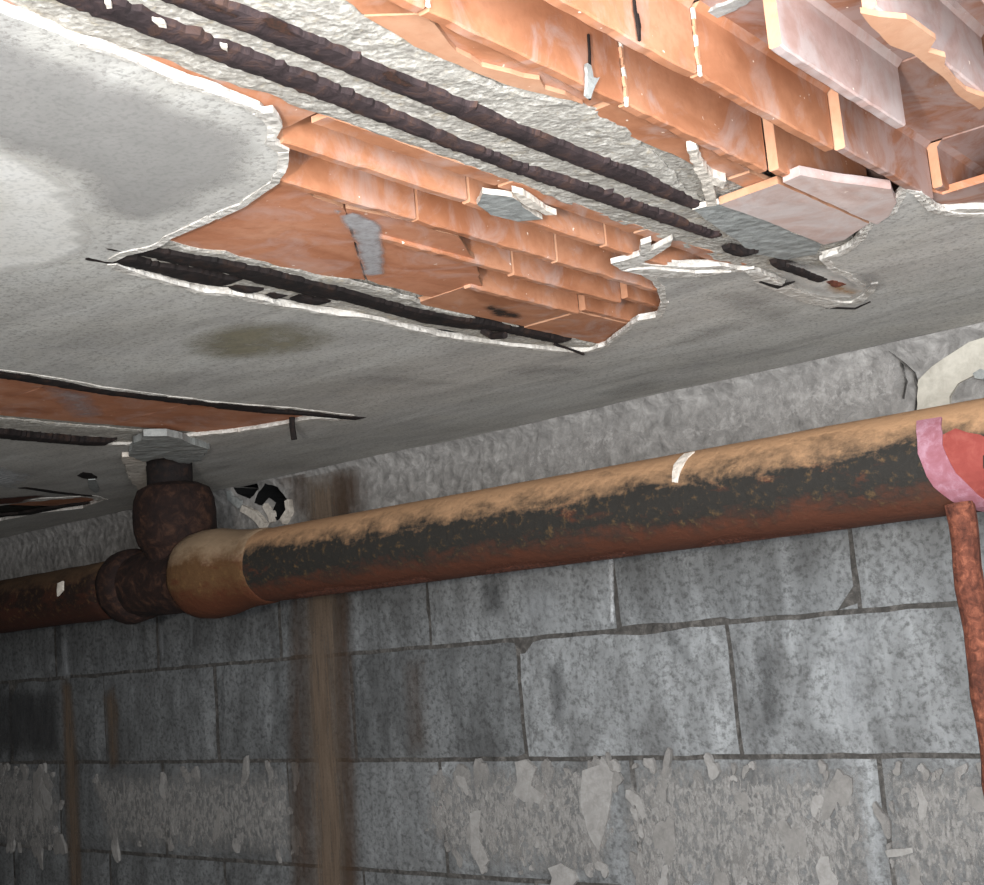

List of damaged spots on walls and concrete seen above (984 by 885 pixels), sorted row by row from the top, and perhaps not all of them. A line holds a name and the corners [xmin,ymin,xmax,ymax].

corrosion [262,18,295,36]
spalling [56,0,874,353]
flaking render [887,188,984,218]
spalling [0,428,132,446]
spalling [0,369,367,438]
peeling [917,338,984,410]
spalling [0,472,108,506]
peeling [425,747,867,885]
peeling [872,760,984,885]